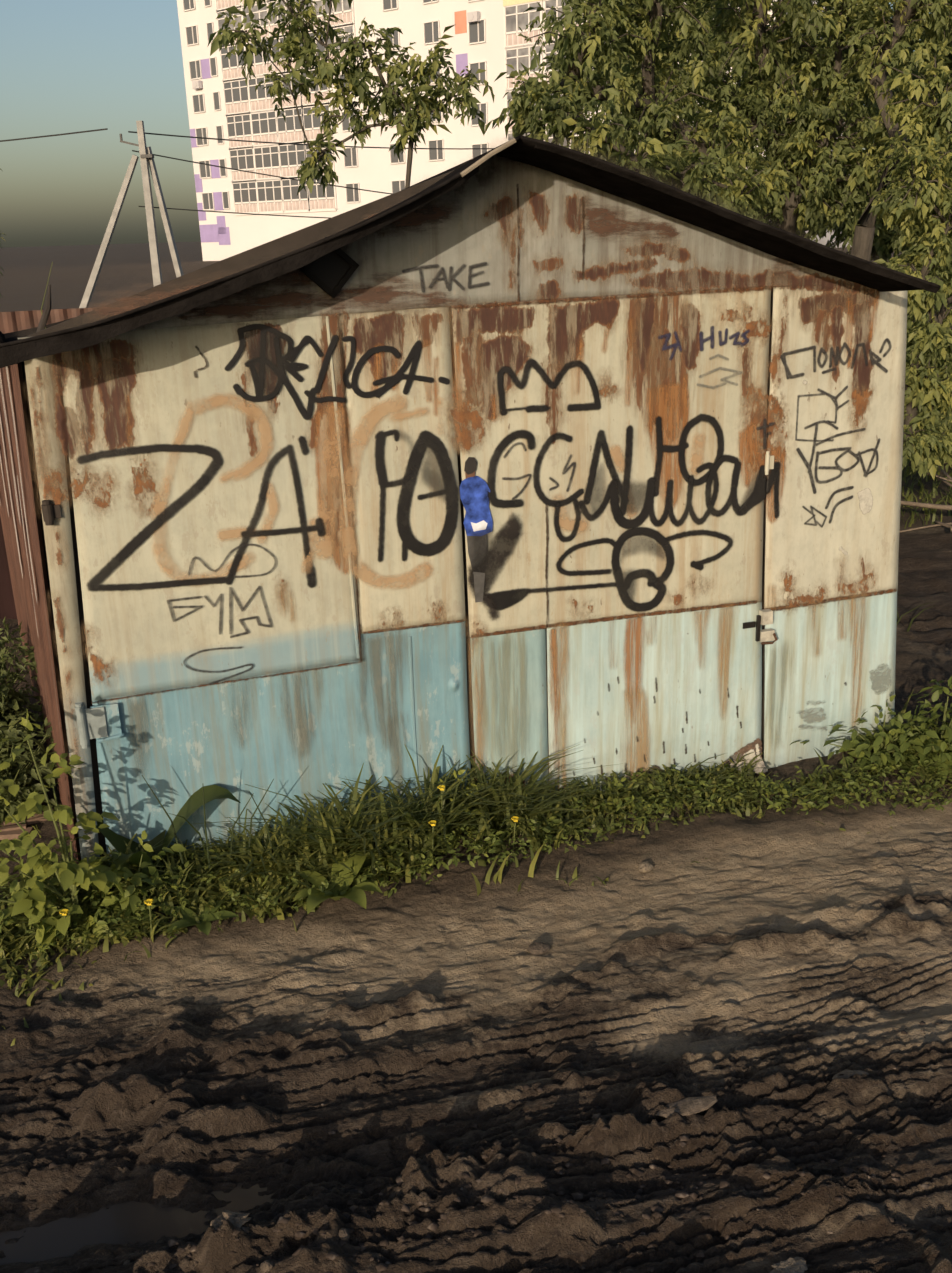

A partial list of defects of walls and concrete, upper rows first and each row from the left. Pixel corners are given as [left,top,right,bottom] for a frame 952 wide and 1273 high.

corrosion [30,338,137,510]
corrosion [131,455,160,515]
corrosion [91,282,210,316]
corrosion [179,190,880,573]
corrosion [363,557,896,797]